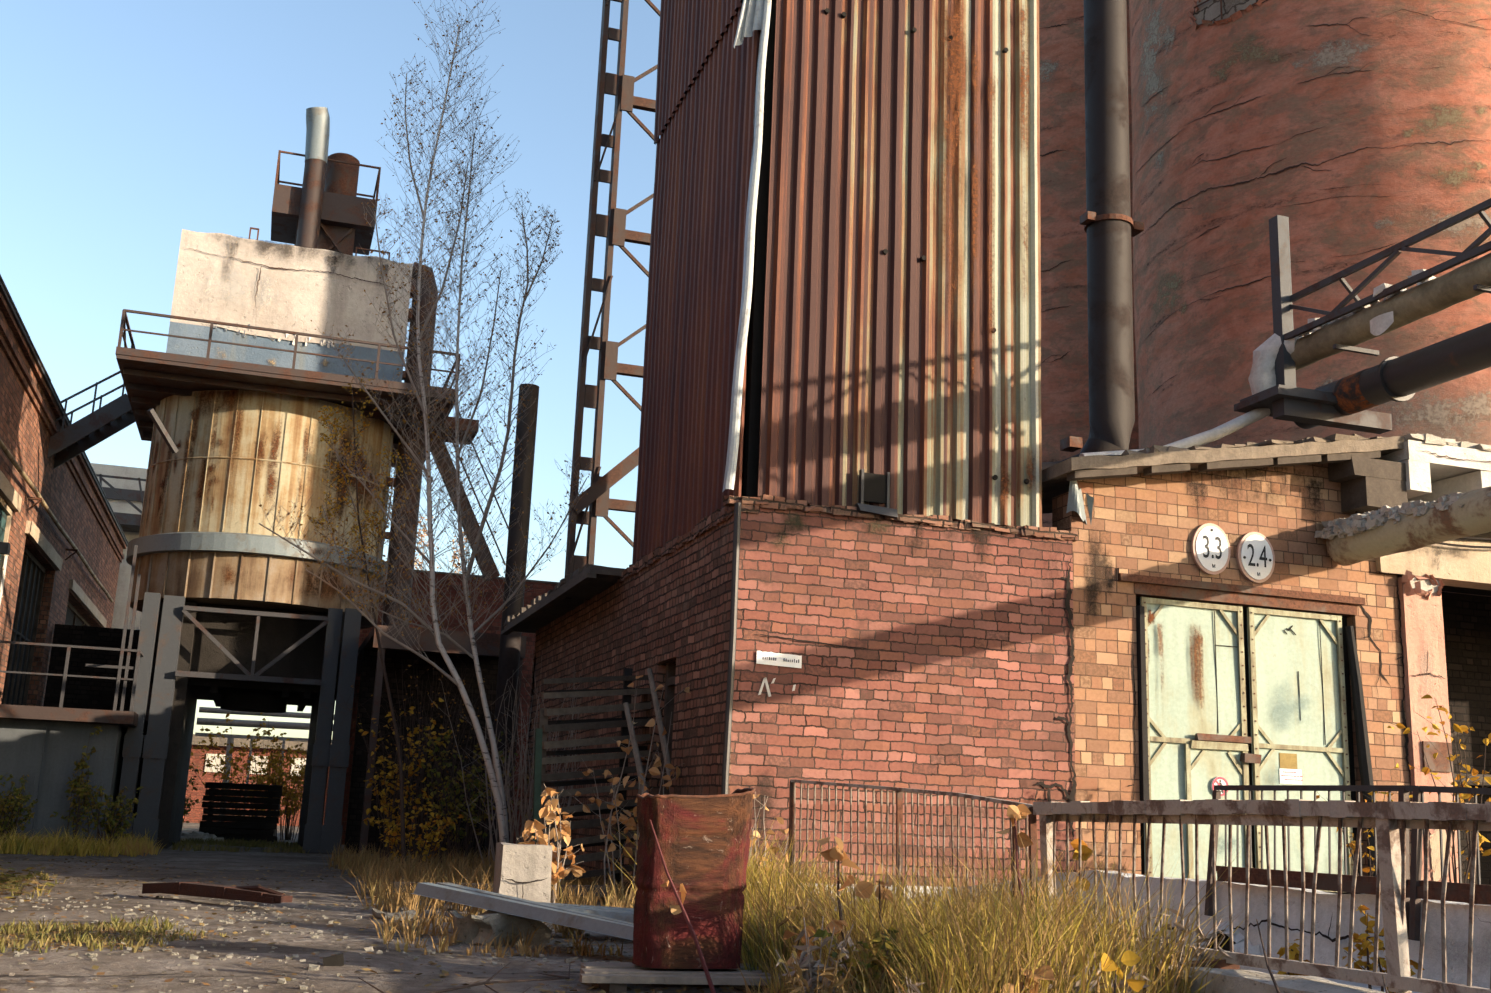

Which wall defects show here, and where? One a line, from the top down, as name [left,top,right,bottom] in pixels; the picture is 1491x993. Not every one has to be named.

rust [1020,9,1029,152]
spalling [1140,0,1264,120]
damp [258,240,312,257]
rust [943,1,995,390]
crack [1135,9,1491,339]
rust [141,391,280,527]
crack [1417,450,1491,462]
crack [1035,543,1077,871]
damp [1086,543,1113,616]
rust [1148,610,1163,658]
rust [1190,627,1204,705]
crack [1360,585,1445,837]